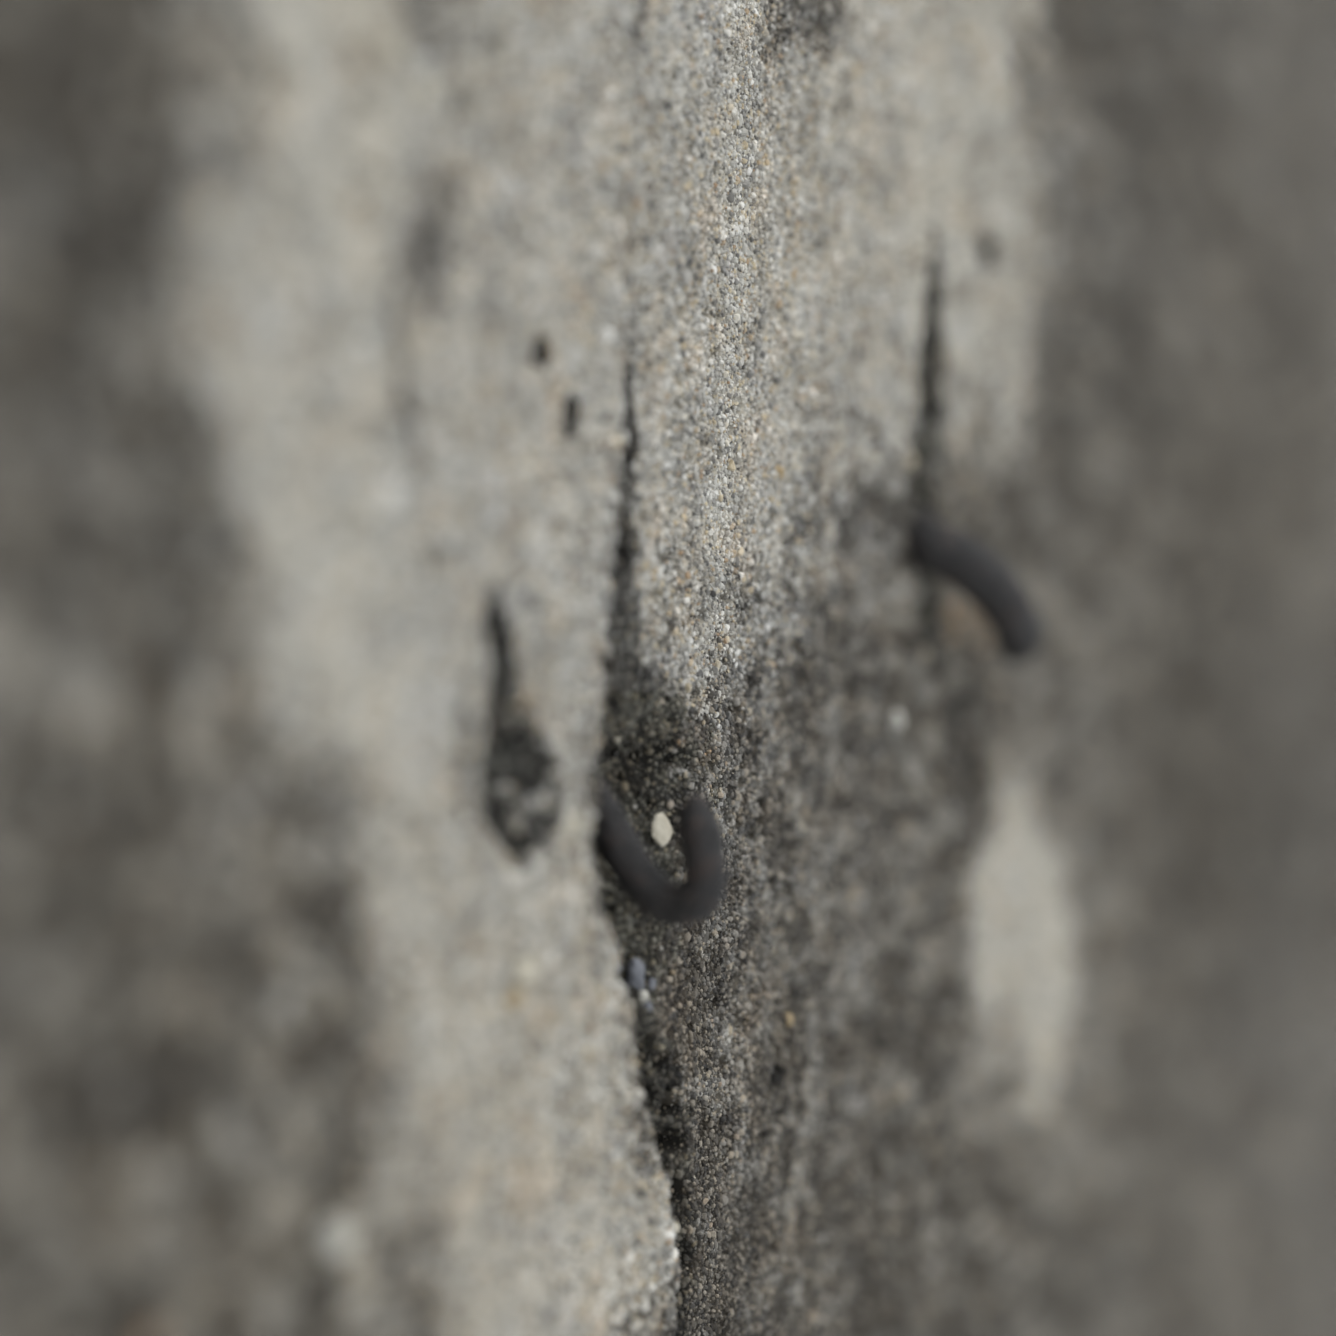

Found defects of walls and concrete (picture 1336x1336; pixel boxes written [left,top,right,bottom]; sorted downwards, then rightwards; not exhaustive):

crack [600,338,676,697]
crack [635,1047,699,1336]